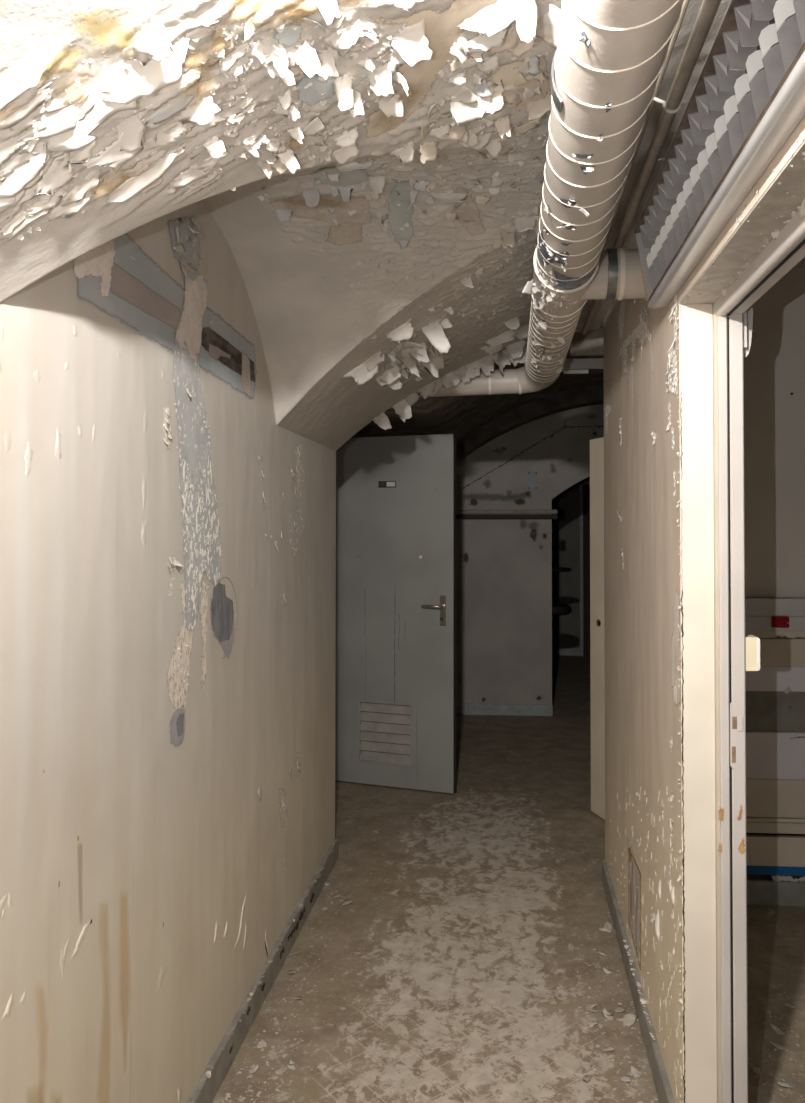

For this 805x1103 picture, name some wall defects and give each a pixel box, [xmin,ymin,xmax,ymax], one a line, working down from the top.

peeling [0,0,597,430]